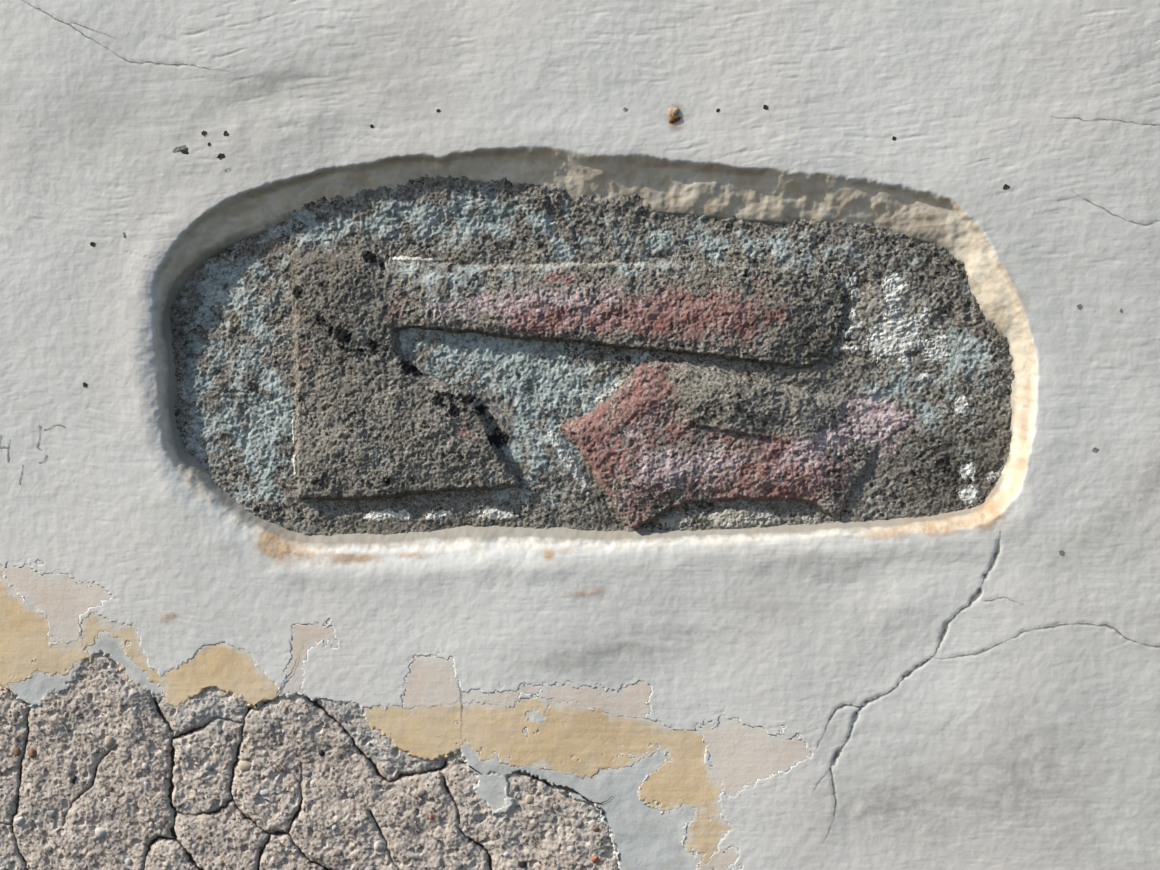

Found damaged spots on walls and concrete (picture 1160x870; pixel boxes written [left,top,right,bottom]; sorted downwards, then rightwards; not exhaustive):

crack [22,0,212,70]
peeling [364,509,452,521]
peeling [469,505,519,520]
peeling [658,513,690,529]
peeling [707,505,782,529]
peeling [800,514,821,525]
crack [1,685,29,870]
crack [144,653,331,870]
spalling [0,560,743,870]
crack [307,679,492,870]
crack [512,771,620,870]
crack [814,533,1160,841]